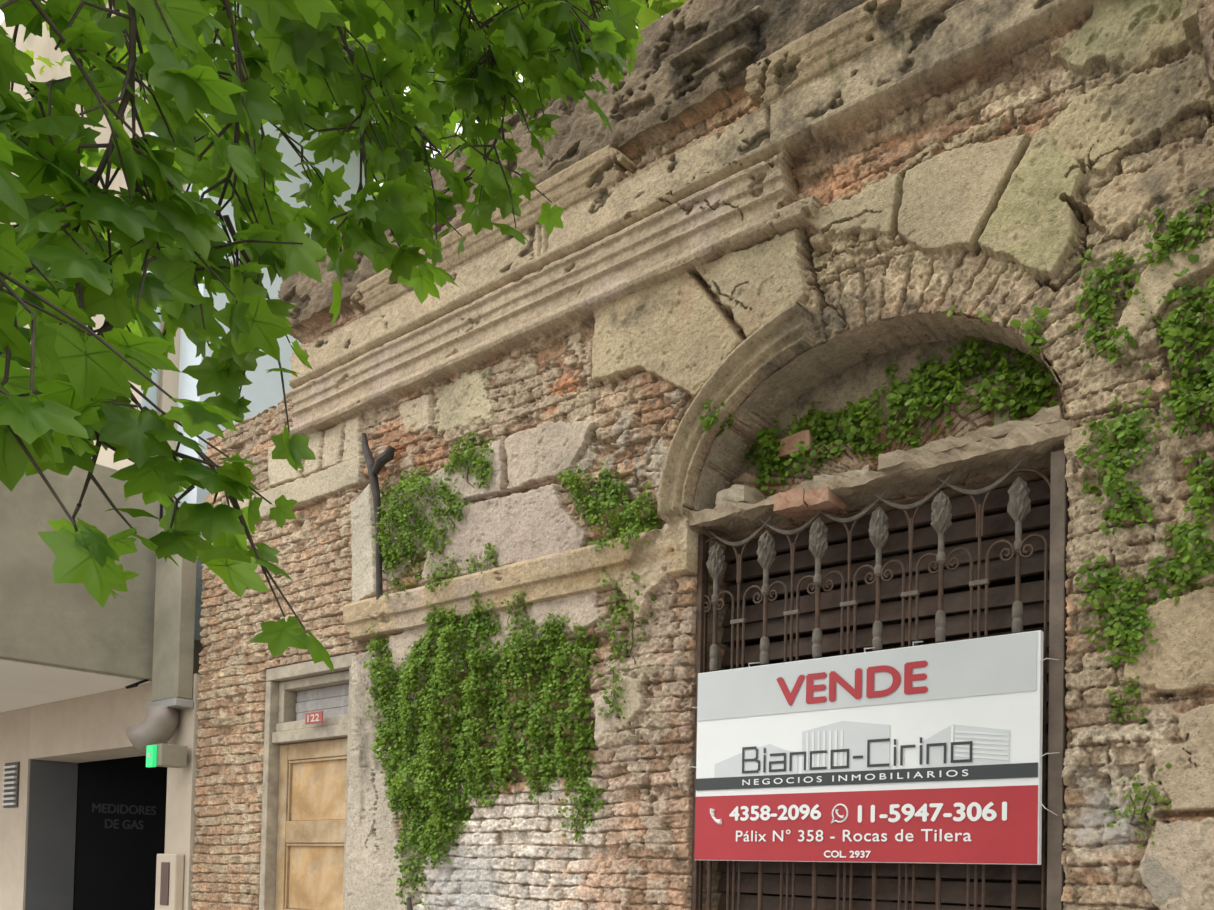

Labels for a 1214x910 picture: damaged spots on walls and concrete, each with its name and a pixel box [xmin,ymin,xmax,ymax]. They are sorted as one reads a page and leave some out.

crack [711,279,753,311]